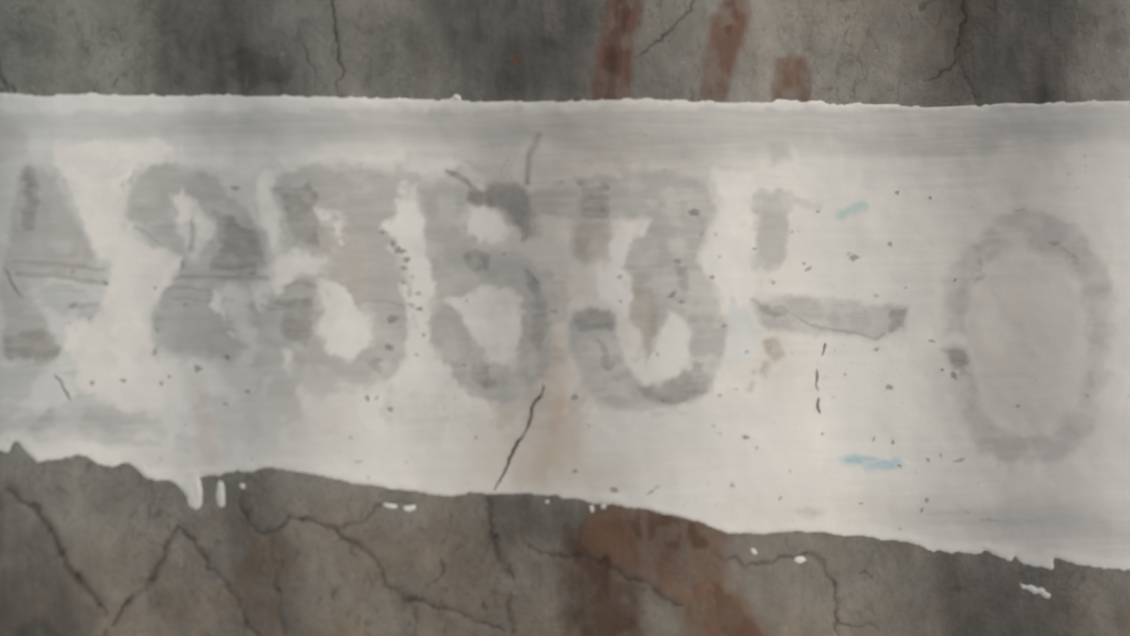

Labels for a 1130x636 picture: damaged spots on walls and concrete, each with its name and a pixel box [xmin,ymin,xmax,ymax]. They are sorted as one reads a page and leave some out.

crack [331,1,341,95]
rust [589,0,647,101]
rust [696,0,755,103]
rust [767,49,815,103]
crack [494,383,544,491]
rust [548,502,783,636]